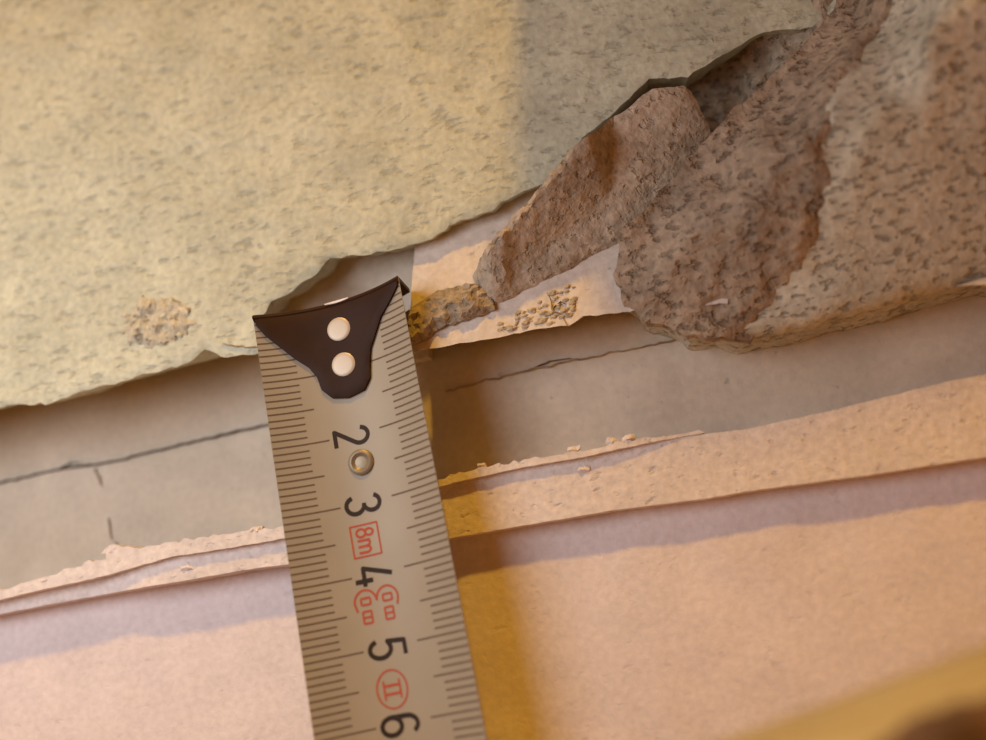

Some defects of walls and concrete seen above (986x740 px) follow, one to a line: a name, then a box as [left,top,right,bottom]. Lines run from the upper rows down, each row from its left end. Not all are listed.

spalling [687,0,833,133]
crack [0,424,269,486]